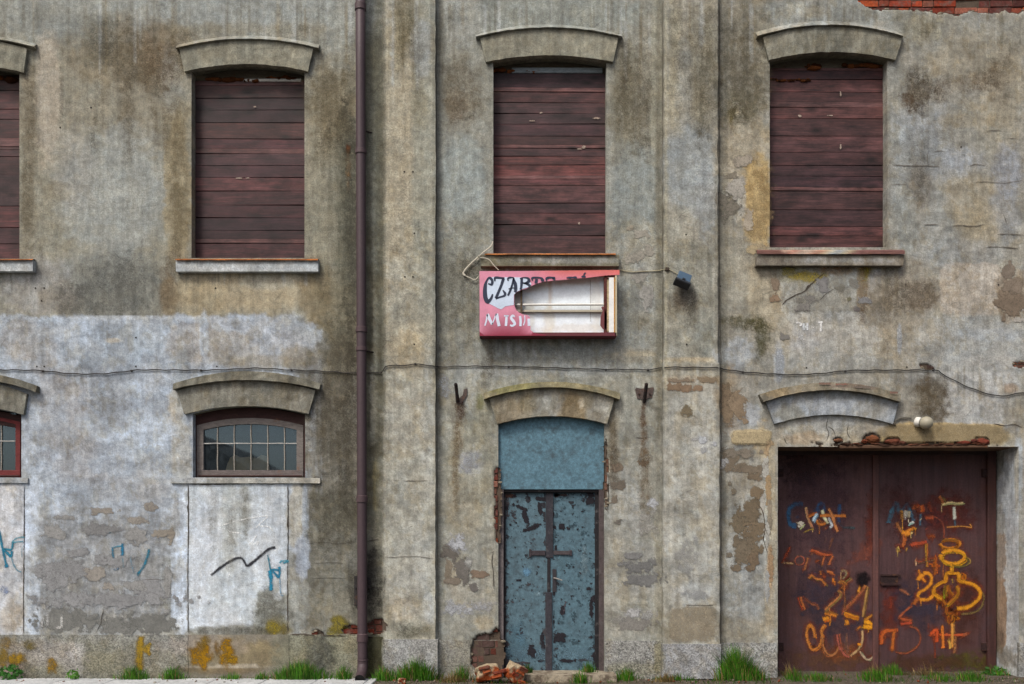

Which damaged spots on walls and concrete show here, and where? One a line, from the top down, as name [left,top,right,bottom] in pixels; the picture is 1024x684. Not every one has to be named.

spalling [858,0,1024,16]
crack [783,273,835,304]
peeling [666,376,774,602]
rust [788,465,872,587]
rust [886,490,975,538]
peeling [20,502,222,637]
peeling [440,544,490,592]
spalling [471,439,626,670]
spalling [342,619,387,636]
rust [794,570,872,662]
rust [895,575,936,624]
rust [950,578,981,628]